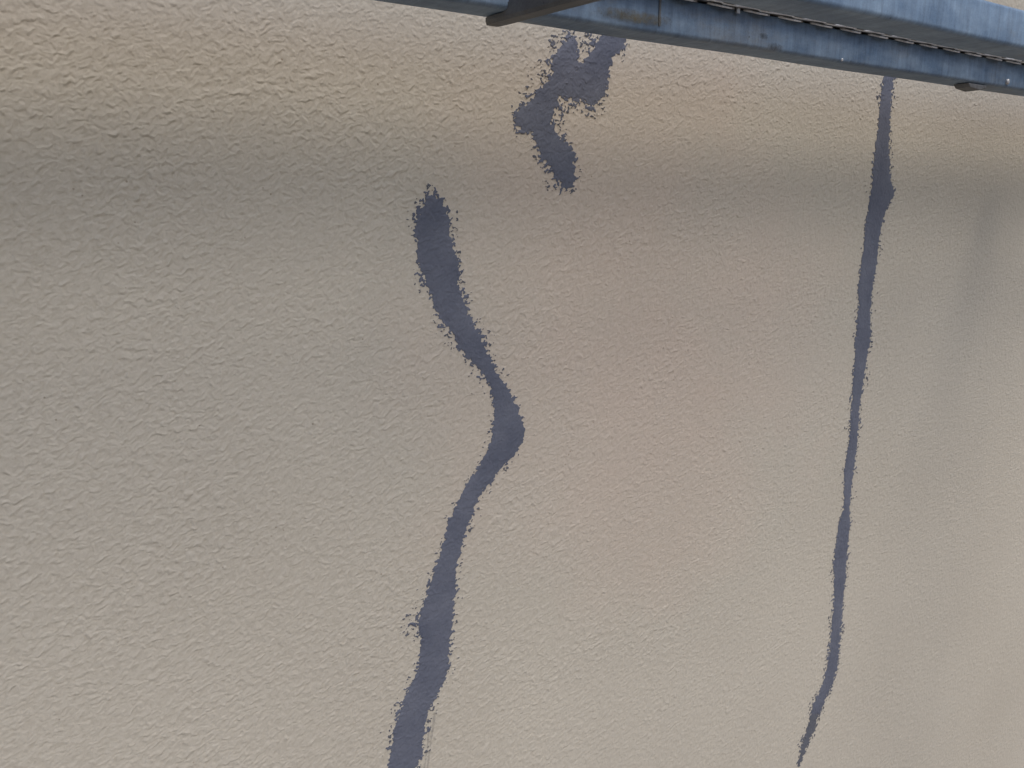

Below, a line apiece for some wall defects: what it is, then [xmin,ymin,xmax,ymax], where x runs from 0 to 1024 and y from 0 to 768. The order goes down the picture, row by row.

crack [796,714,819,767]